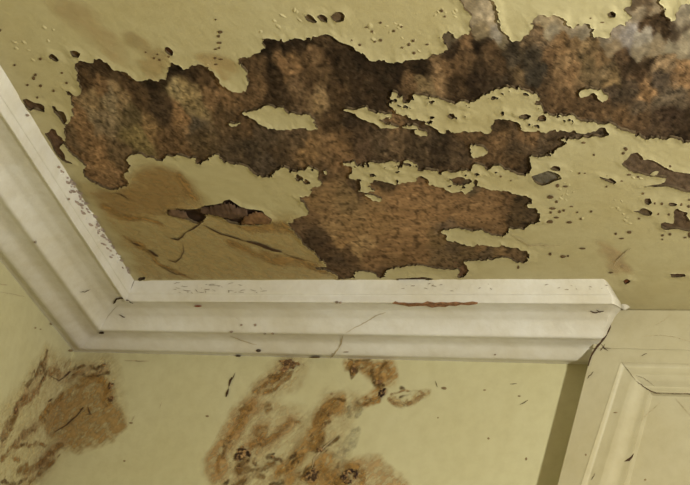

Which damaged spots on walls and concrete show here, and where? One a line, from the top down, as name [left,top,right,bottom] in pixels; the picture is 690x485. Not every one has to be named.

peeling [47,0,690,280]
crack [133,221,311,293]
leakage [1,350,126,485]
leakage [207,359,430,485]